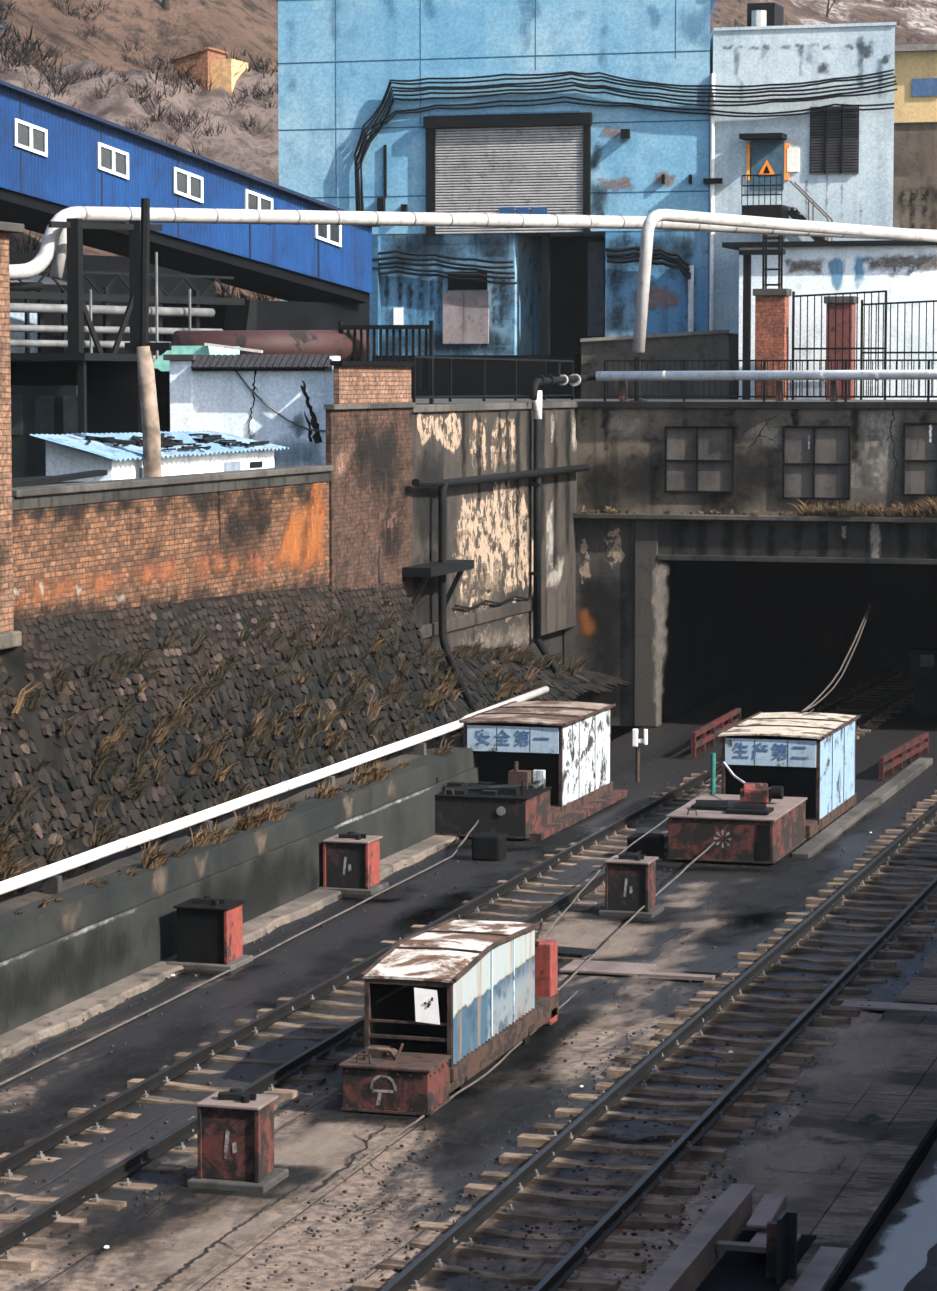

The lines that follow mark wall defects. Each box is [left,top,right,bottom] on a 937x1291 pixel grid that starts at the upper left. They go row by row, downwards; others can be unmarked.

peeling [634,287,677,309]
rust [279,485,324,567]
flaking render [417,411,564,642]
spalling [579,539,591,584]
spalling [605,528,625,569]